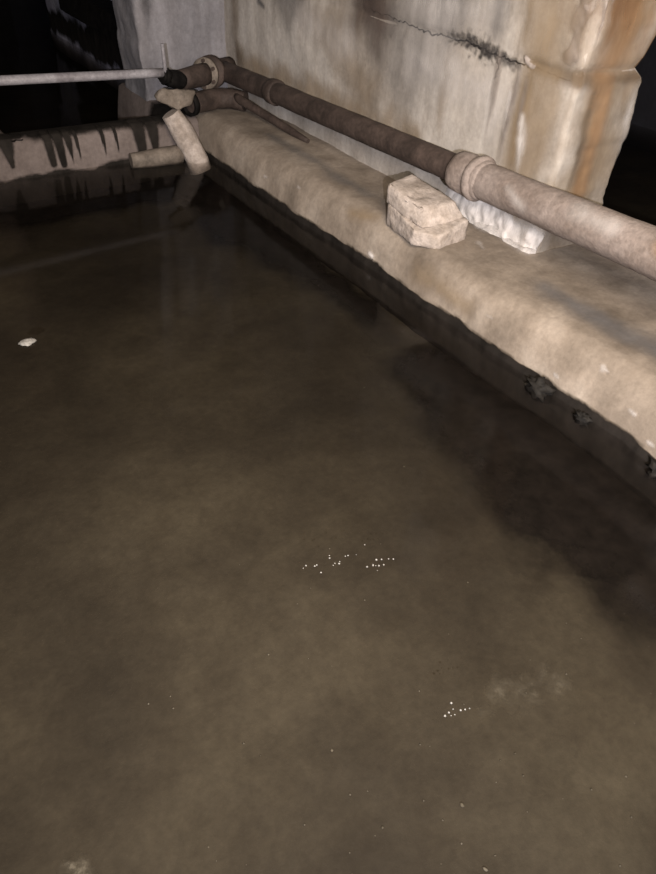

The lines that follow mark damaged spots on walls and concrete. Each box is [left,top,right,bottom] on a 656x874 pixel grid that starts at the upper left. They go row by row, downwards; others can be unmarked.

crack [389,15,536,79]
corrosion [569,0,646,196]